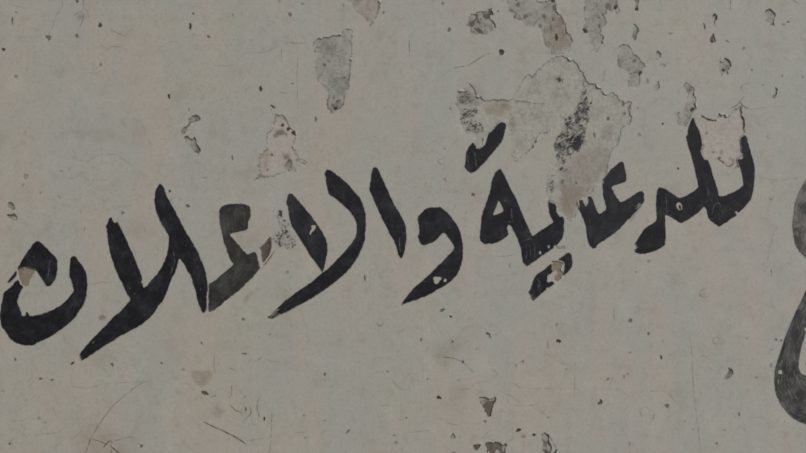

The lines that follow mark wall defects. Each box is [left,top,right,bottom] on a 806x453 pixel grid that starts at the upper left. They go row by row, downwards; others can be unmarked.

peeling [342,0,385,26]
peeling [313,29,353,114]
peeling [616,24,660,91]
peeling [181,108,201,154]
peeling [254,105,307,181]
peeling [449,0,639,222]
peeling [677,82,745,171]
peeling [473,441,507,453]